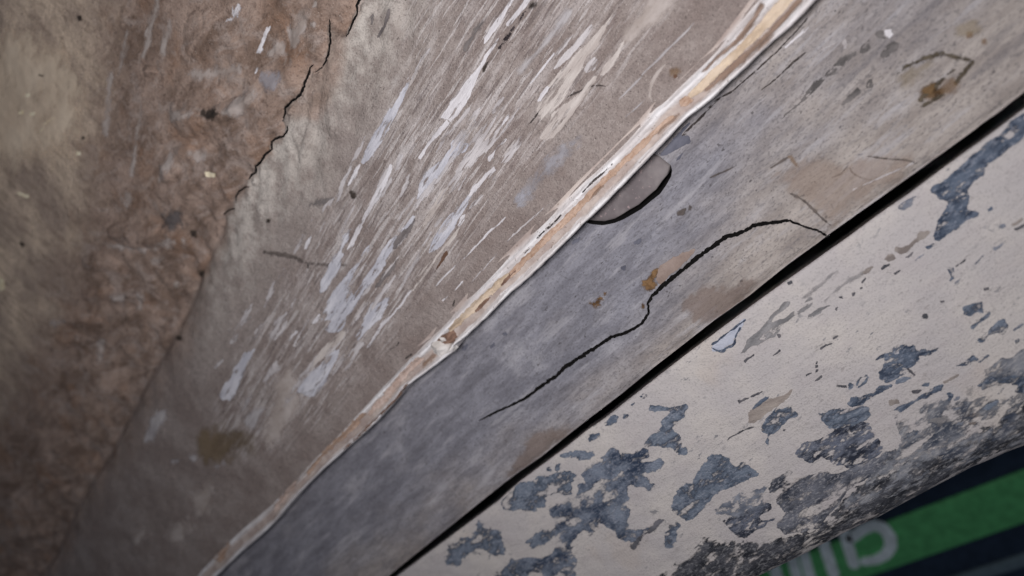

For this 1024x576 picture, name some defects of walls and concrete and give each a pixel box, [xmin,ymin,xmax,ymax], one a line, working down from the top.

crack [224,0,361,214]
spalling [274,0,803,513]
crack [582,164,612,193]
corrosion [642,268,659,290]
crack [481,193,829,420]
peeling [711,113,1024,363]
peeling [445,287,1024,576]